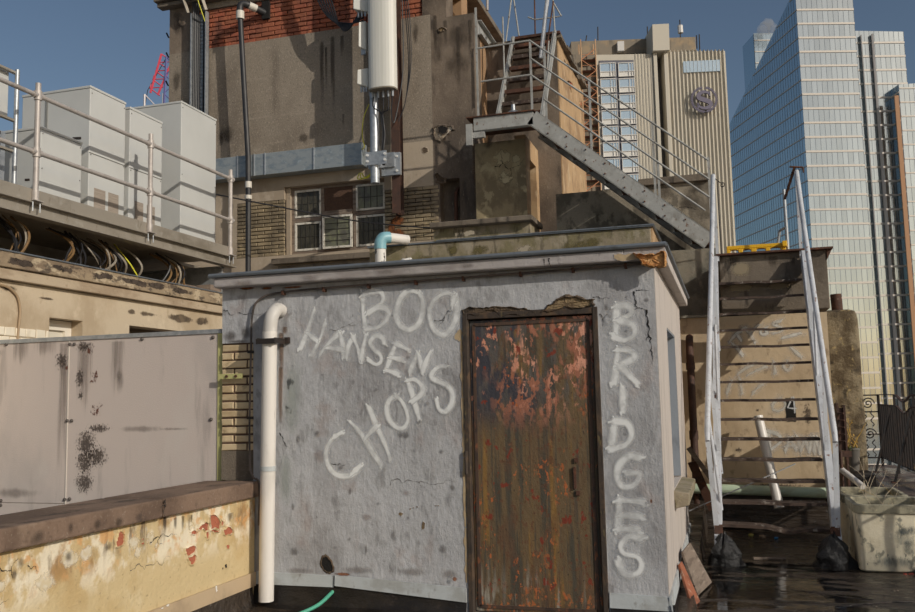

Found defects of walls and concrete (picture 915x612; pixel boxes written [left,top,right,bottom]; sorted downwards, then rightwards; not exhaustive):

spalling [613,251,667,268]
spalling [462,294,595,316]
leakage [170,314,208,325]
crack [593,289,653,365]
mould [57,354,98,398]
mould [75,405,110,493]
spalling [114,529,125,549]
spalling [184,513,234,567]
leakage [61,545,92,568]
spalling [321,557,333,572]